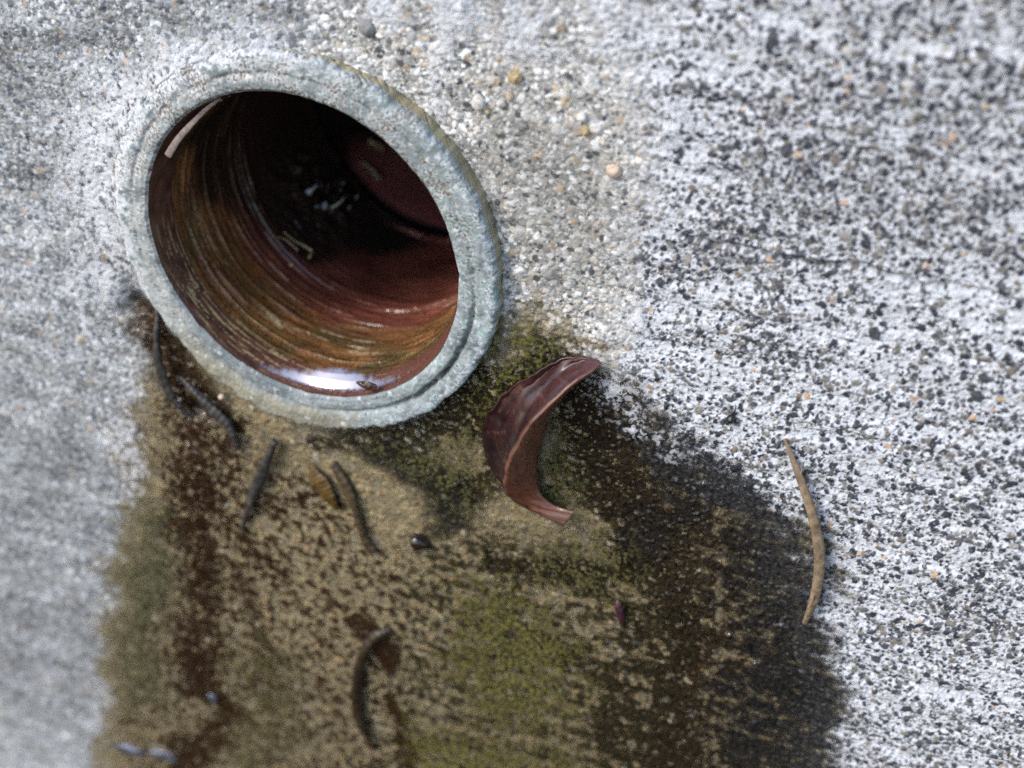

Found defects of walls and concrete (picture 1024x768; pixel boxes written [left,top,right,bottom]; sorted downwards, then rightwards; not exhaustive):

leakage [90,303,864,768]